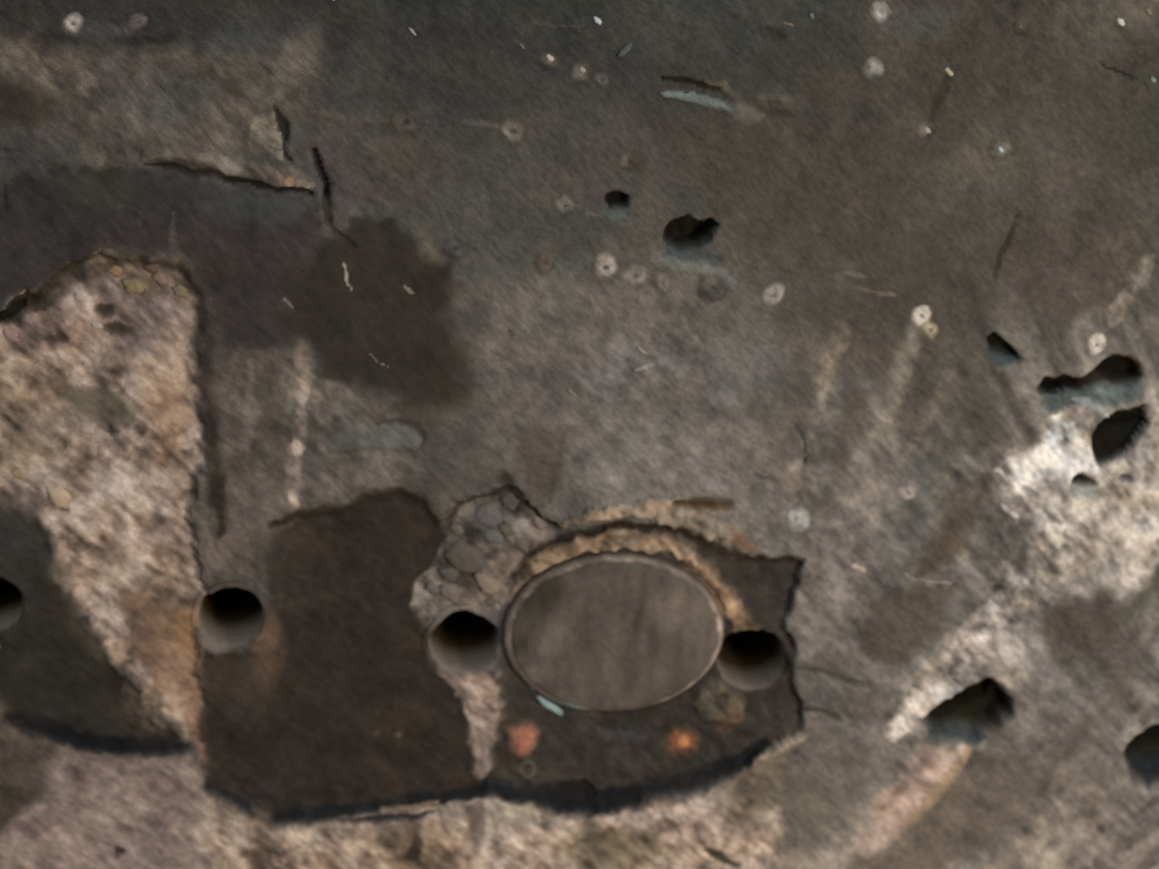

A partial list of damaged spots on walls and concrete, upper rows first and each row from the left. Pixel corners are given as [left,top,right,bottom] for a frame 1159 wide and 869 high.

crack [142,104,355,247]
leakage [282,214,482,503]
spalling [0,159,810,833]
leakage [881,372,1159,744]
spalling [1034,353,1147,501]
spalling [920,677,1015,747]
spalling [1121,724,1159,792]
spalling [114,846,126,860]